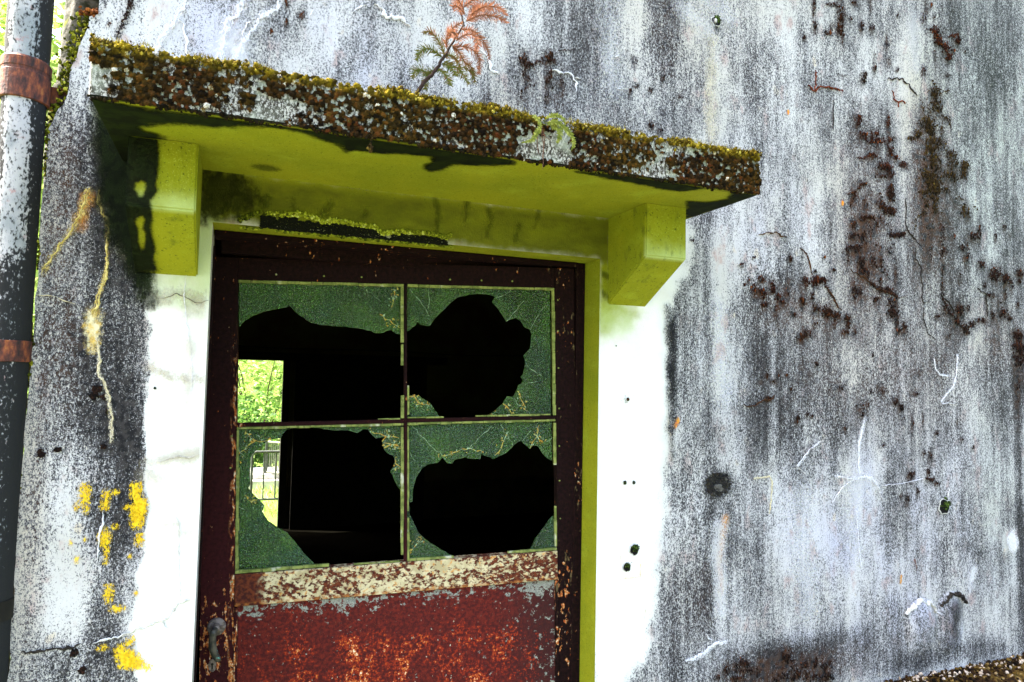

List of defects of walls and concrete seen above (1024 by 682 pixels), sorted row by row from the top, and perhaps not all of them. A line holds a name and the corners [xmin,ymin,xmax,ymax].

damp [86,100,516,310]
damp [576,171,757,219]
damp [83,309,101,349]
damp [663,303,678,460]
crack [851,199,989,404]
damp [708,517,728,618]
crack [833,418,923,567]
damp [1007,530,1019,553]